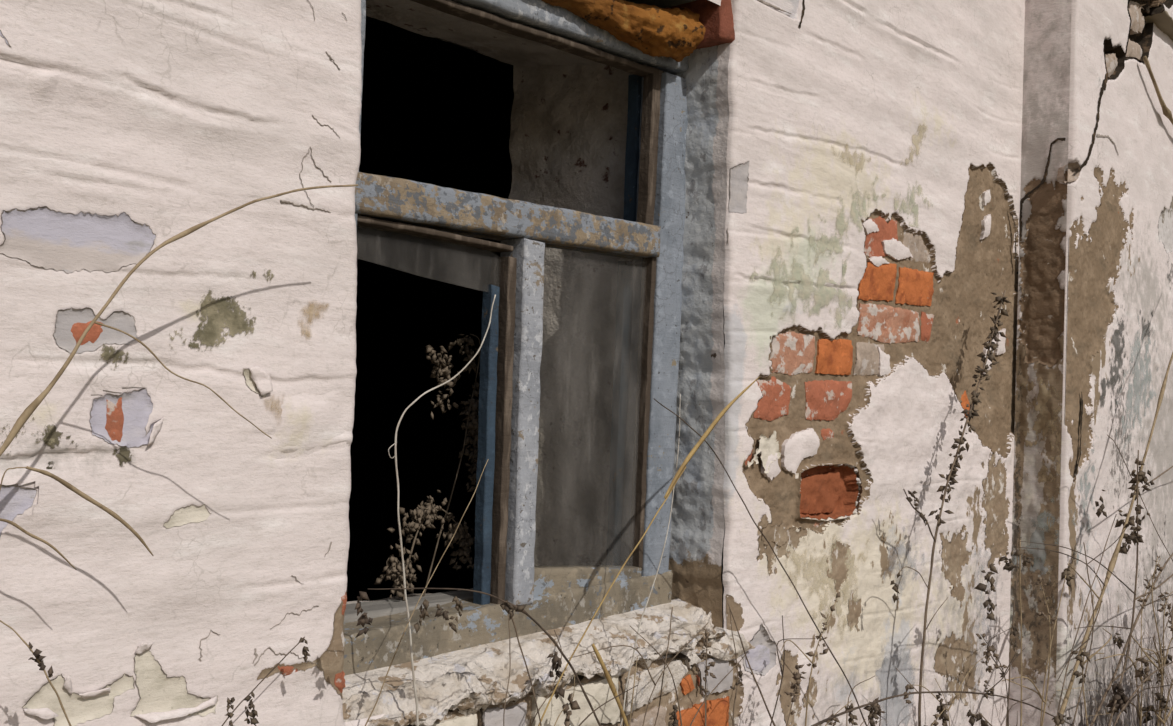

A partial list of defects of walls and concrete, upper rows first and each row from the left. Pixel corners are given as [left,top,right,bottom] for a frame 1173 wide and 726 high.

crack [757,0,805,28]
crack [1011,72,1119,269]
peeling [0,206,156,273]
peeling [53,307,137,353]
mould [169,290,256,351]
peeling [89,388,164,448]
spalling [742,162,1134,607]
peeling [0,485,37,537]
spalling [726,594,744,631]
peeling [827,540,861,631]
peeling [22,642,218,726]
spalling [415,624,817,726]